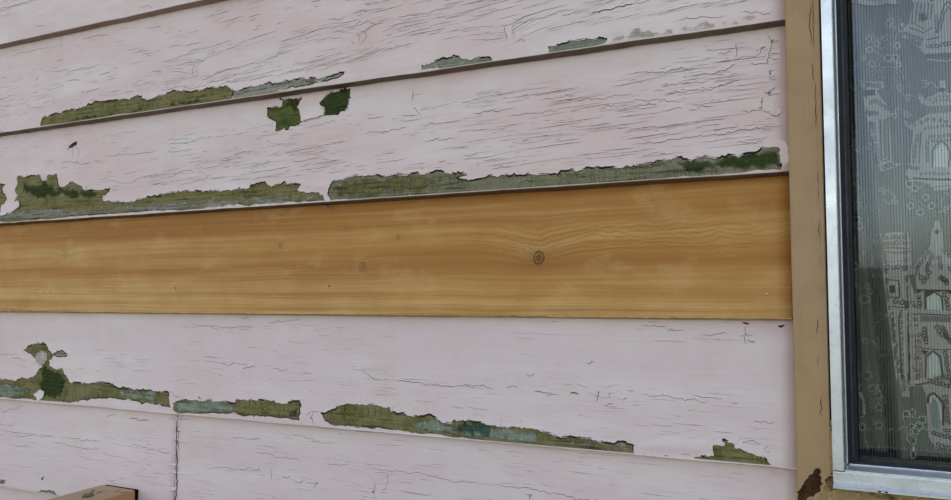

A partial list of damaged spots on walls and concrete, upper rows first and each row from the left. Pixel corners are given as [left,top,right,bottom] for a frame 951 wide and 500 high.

peeling [421,50,492,70]
crack [808,0,816,115]
peeling [40,68,357,137]
crack [0,0,782,191]
peeling [0,138,789,222]
peeling [0,338,305,423]
crack [2,317,785,488]
peeling [318,395,637,453]
peeling [695,434,771,465]
peeling [38,474,56,495]
crack [370,469,610,500]